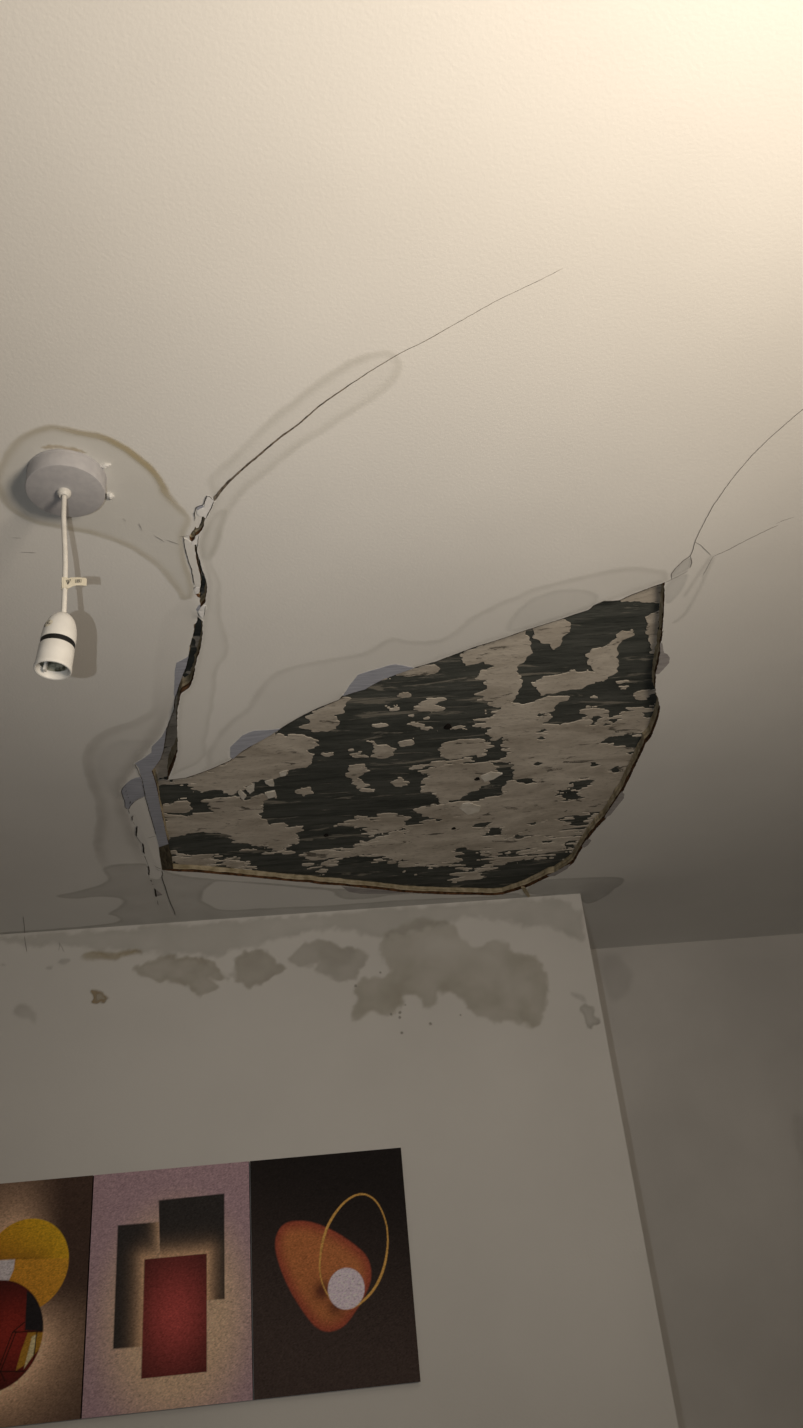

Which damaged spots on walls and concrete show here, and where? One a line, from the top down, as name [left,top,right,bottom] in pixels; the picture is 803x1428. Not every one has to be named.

damp [68,430,170,498]
crack [135,269,561,847]
spalling [121,582,670,913]